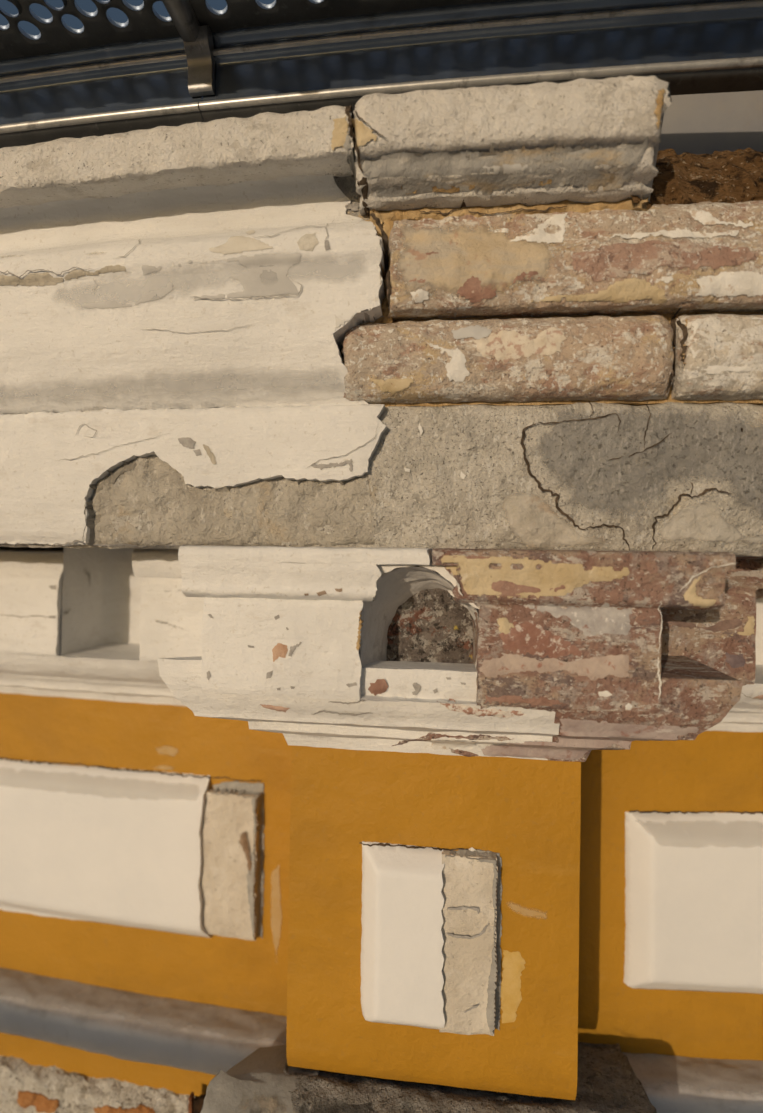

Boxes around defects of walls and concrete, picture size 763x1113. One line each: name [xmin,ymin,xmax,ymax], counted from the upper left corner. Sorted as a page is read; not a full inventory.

peeling [0,265,126,286]
peeling [193,230,330,300]
peeling [491,213,567,244]
flaking render [570,210,763,297]
peeling [431,325,567,382]
crack [520,308,732,550]
flaking render [54,428,377,550]
flaking render [392,551,763,760]
peeling [212,781,265,940]
peeling [445,848,525,1035]
flaking render [17,1091,59,1113]
flaking render [94,1104,156,1113]